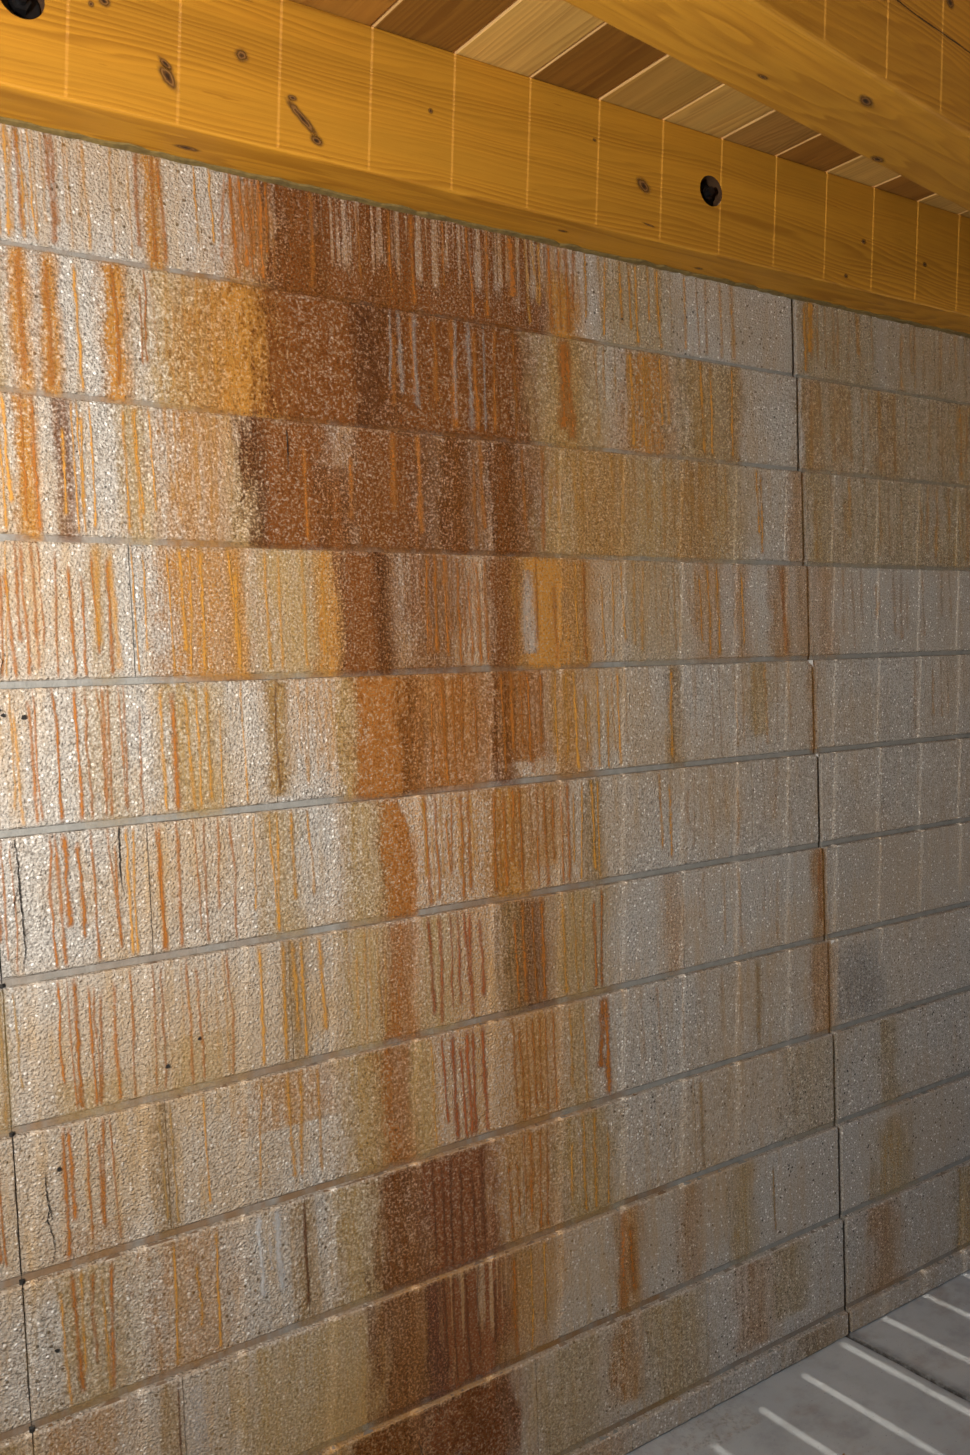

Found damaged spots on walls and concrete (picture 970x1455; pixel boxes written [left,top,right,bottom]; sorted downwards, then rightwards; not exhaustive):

rust [0,126,114,676]
rust [799,303,918,564]
rust [9,693,144,821]
rust [100,154,734,1455]
rust [0,852,18,957]
rust [49,834,139,966]
rust [57,977,136,1107]
rust [62,1125,121,1257]
rust [60,1267,115,1403]